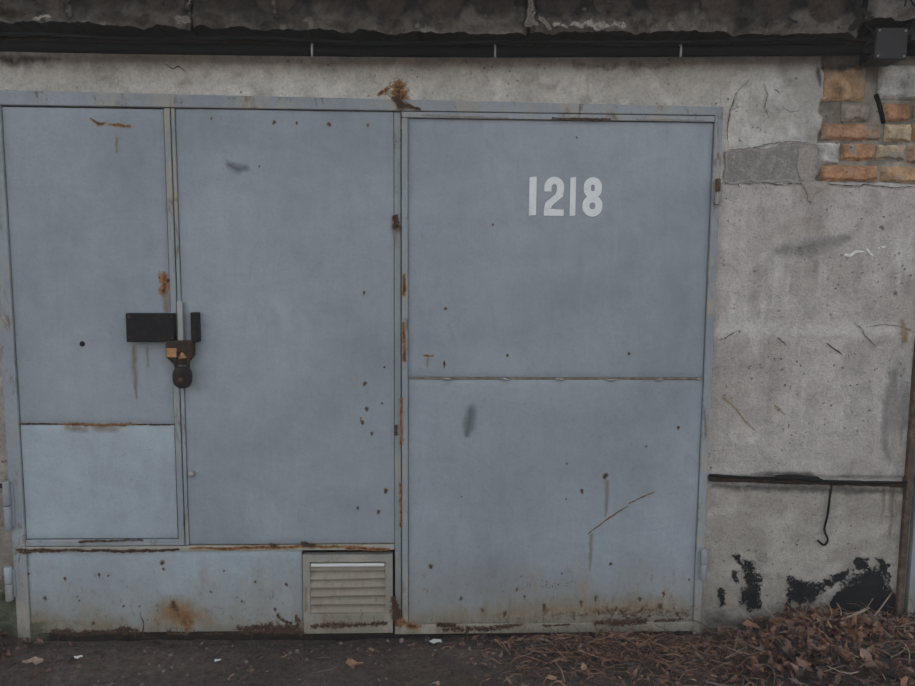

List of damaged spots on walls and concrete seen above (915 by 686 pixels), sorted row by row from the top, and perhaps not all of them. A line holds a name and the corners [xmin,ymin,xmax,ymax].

rust [377,78,421,110]
flaking render [818,65,915,183]
rust [159,270,170,297]
rust [16,539,390,571]
rust [50,606,145,638]
rust [160,596,421,638]
rust [436,592,691,634]